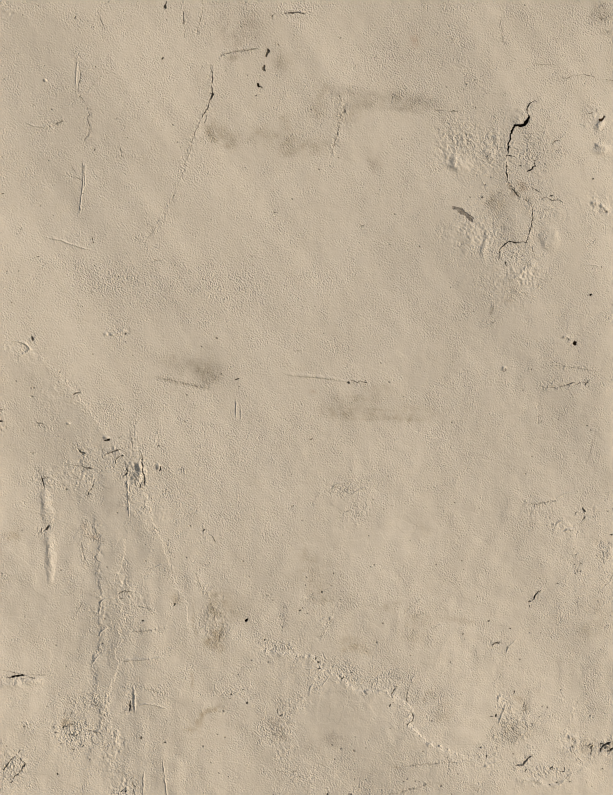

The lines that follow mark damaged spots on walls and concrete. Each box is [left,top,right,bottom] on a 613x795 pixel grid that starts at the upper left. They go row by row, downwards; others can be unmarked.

crack [498,100,568,268]